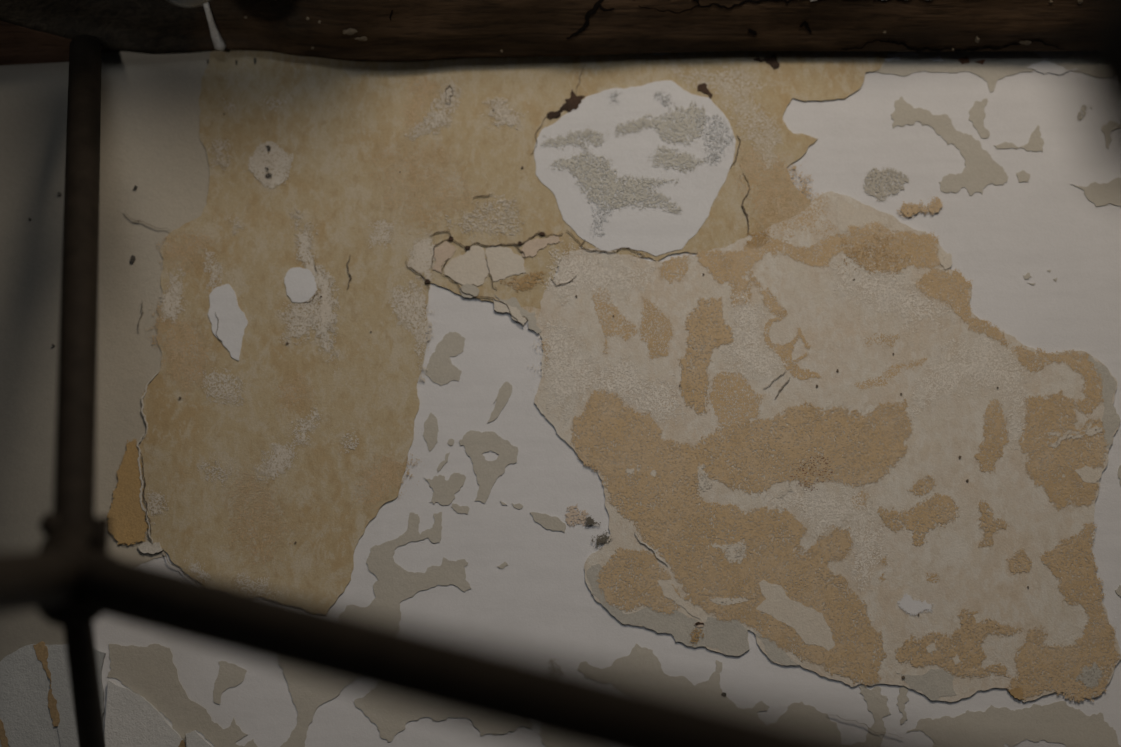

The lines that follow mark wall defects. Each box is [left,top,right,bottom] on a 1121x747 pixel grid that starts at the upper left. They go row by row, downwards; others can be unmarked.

crack [566,0,812,39]
crack [406,230,643,326]
peeling [137,50,1121,724]
peeling [280,669,345,747]
peeling [354,694,447,742]
peeling [859,685,891,733]
peeling [906,701,1121,747]